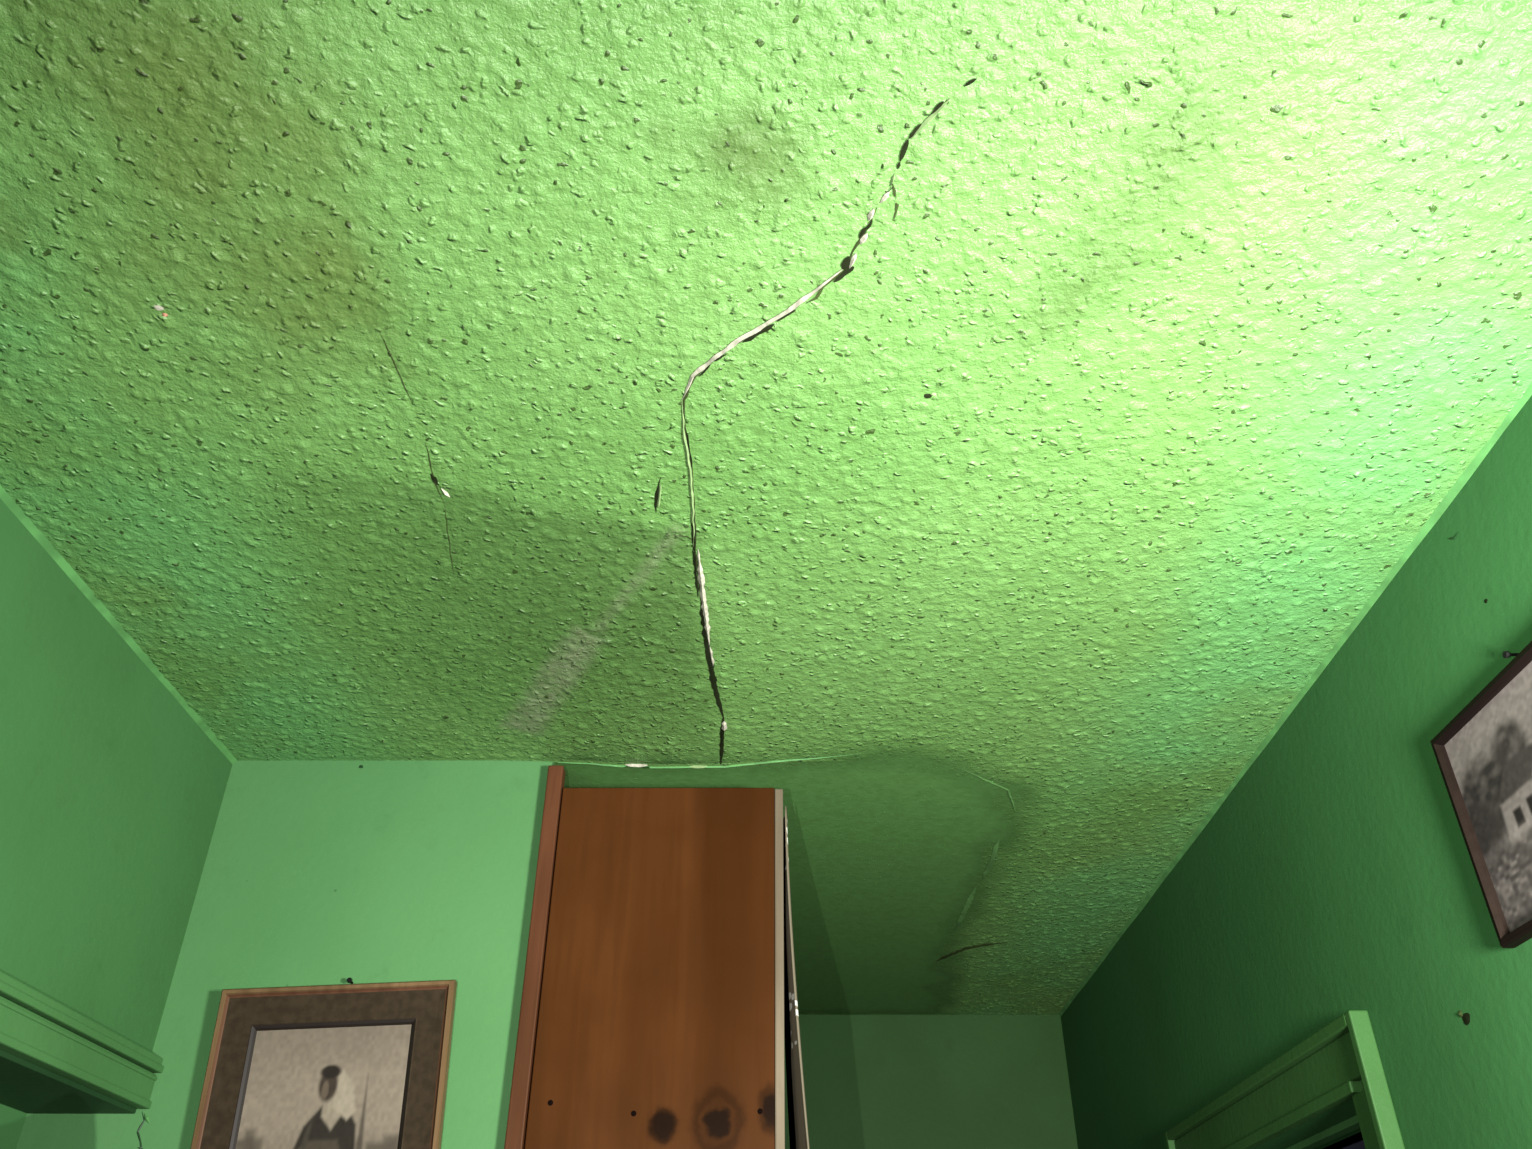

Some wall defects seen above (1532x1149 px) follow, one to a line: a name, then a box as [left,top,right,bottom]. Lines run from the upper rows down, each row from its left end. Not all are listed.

crack [546,78,977,768]